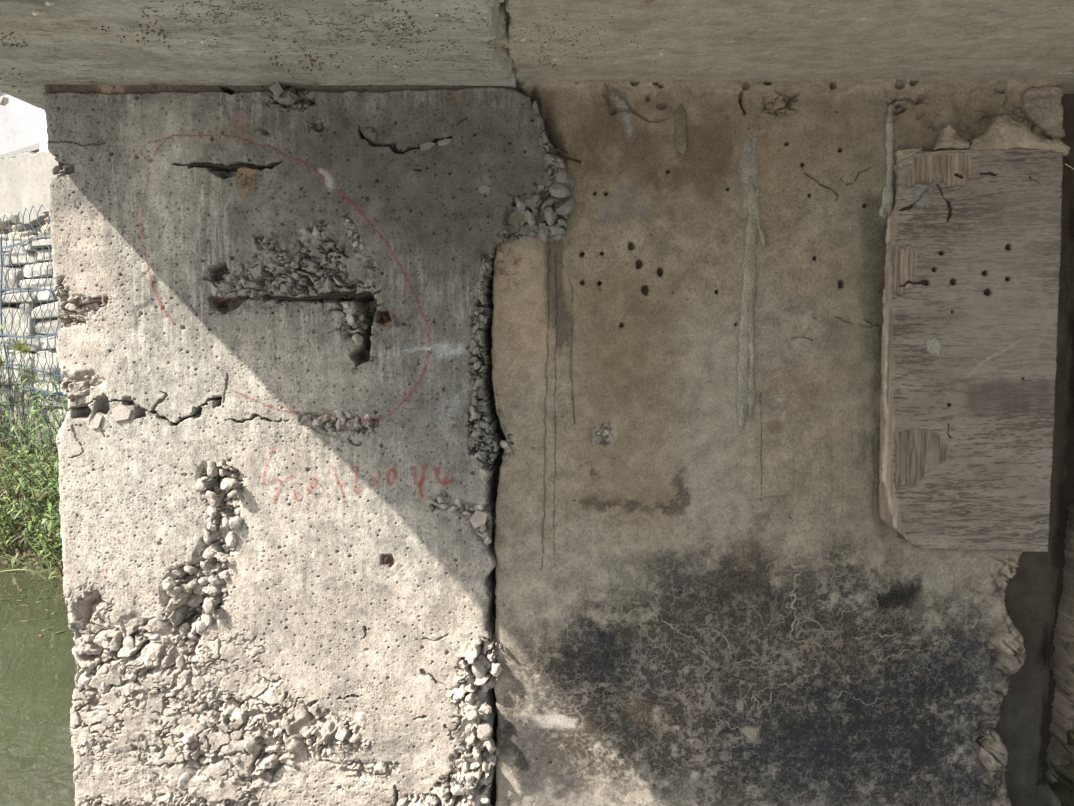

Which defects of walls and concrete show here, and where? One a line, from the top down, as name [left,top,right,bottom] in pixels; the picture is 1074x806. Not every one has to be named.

crack [502,0,512,47]
crack [358,117,469,154]
crack [172,160,283,179]
spalling [205,211,390,371]
spalling [468,97,582,468]
crack [72,375,289,457]
spalling [429,491,496,545]
spalling [76,589,106,629]
water stain [498,550,996,806]
spalling [1050,560,1074,743]
spalling [80,796,207,806]
spalling [338,759,401,796]